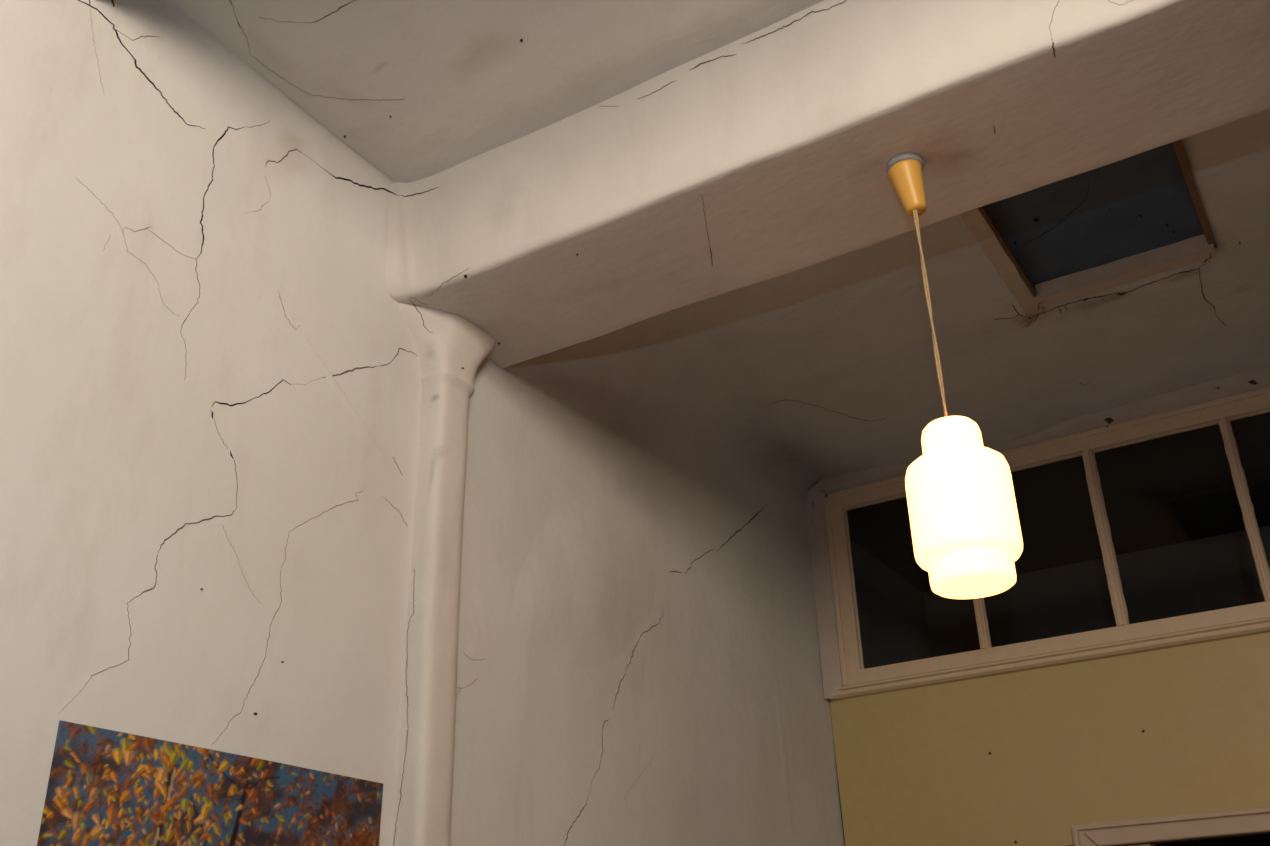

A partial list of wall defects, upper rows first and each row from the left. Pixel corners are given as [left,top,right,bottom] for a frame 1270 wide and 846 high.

crack [606,0,846,107]
crack [76,0,268,380]
crack [250,149,438,213]
crack [59,270,465,746]
crack [669,496,772,573]
crack [564,608,664,845]